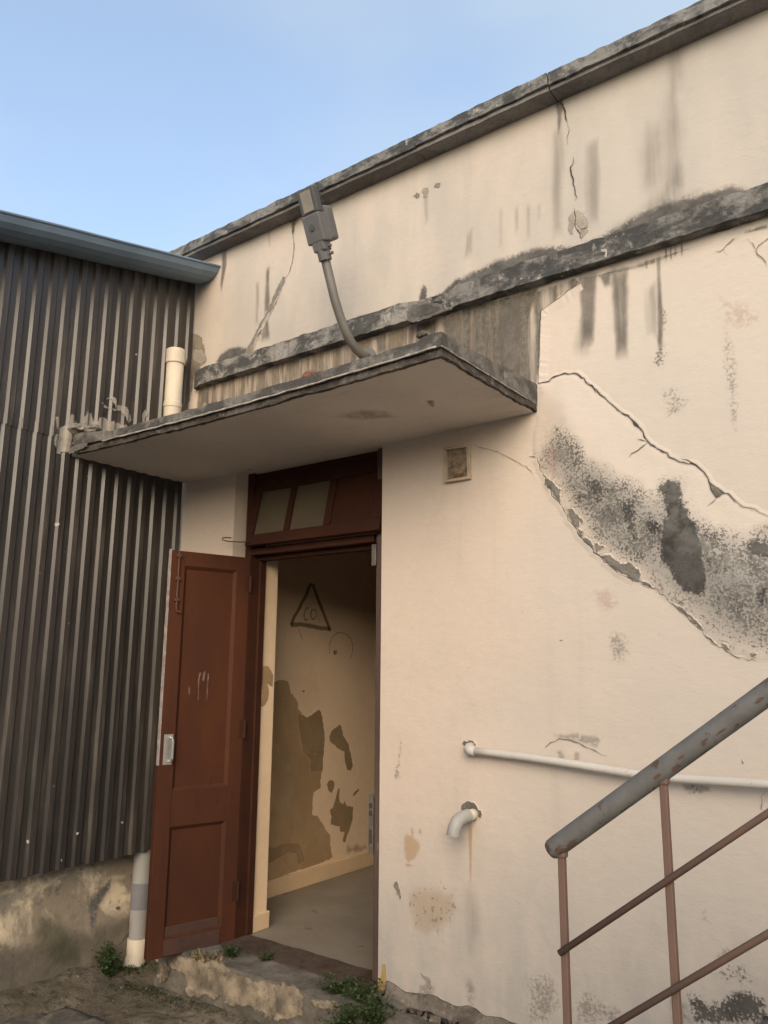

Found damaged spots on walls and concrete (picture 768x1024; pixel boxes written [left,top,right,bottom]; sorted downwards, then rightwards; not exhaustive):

peeling [568,210,604,239]
crack [717,238,768,265]
leakage [198,286,557,408]
leakage [570,272,626,347]
leakage [655,279,666,366]
spalling [69,348,537,455]
crack [541,369,768,517]
leakage [541,433,768,648]
corrosion [555,839,577,855]
leakage [88,883,110,927]
leakage [690,965,767,1024]